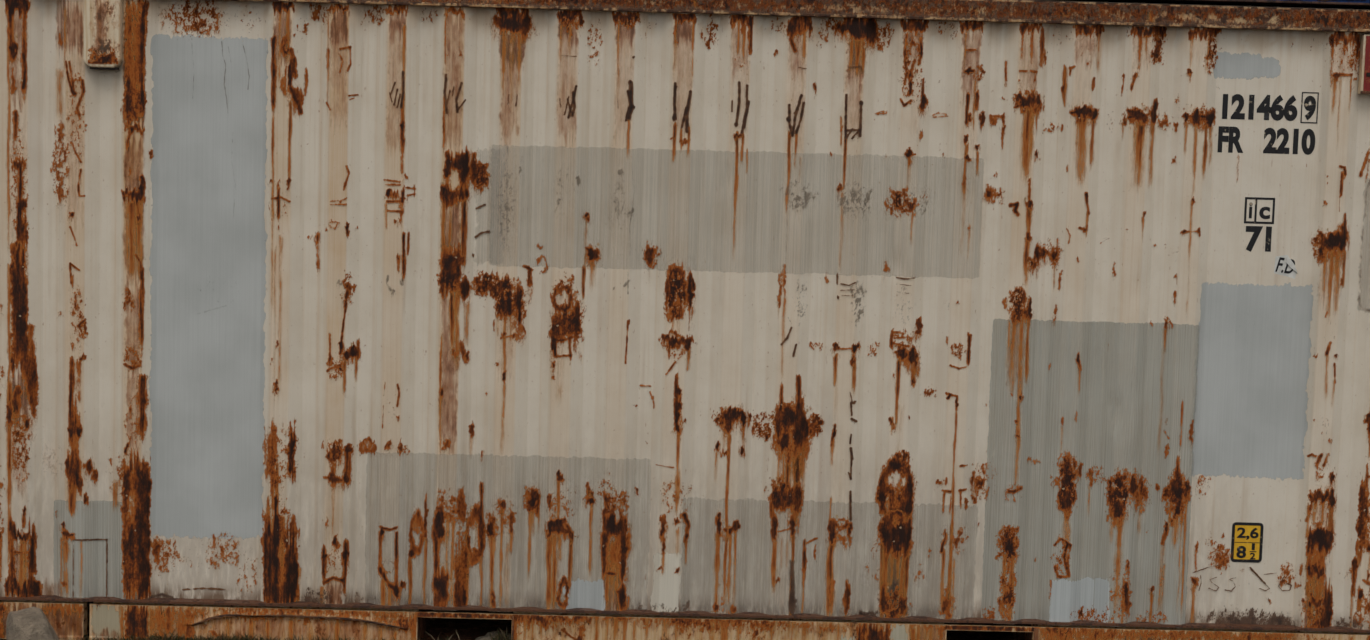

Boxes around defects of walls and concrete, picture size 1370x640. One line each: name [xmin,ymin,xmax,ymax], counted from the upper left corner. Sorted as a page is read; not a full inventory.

rust [50,0,927,640]
rust [268,0,1370,502]
rust [909,388,1337,640]
rust [1339,412,1370,640]